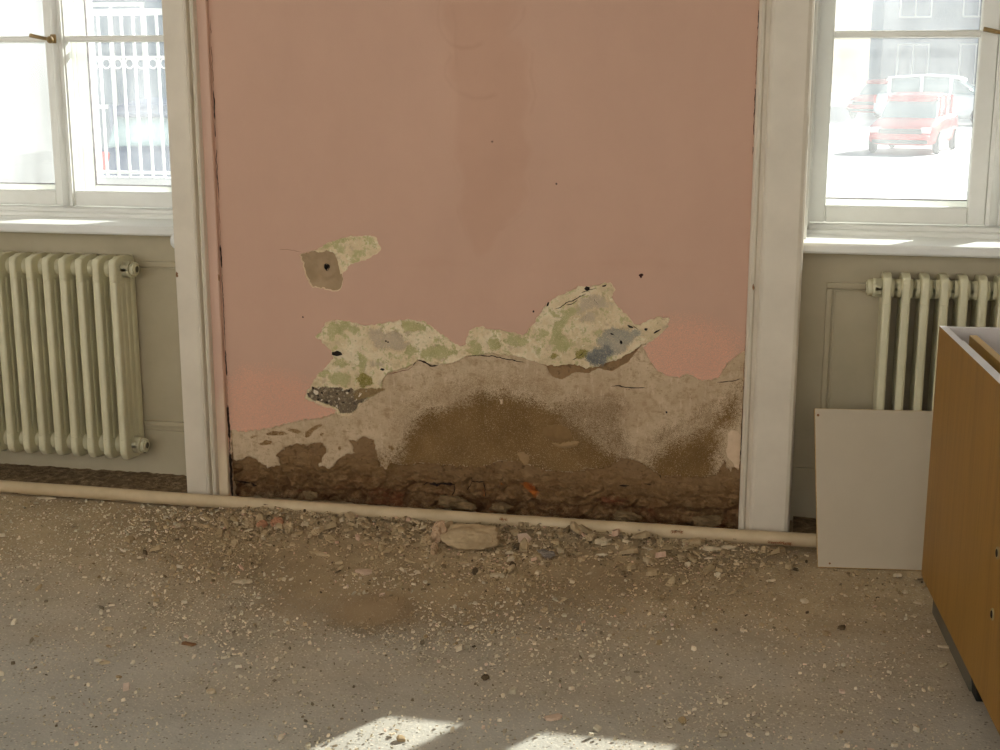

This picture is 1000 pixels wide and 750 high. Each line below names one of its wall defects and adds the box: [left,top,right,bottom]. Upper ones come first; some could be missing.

peeling [301,235,381,290]
flaking render [231,283,745,531]
leakage [373,367,744,478]